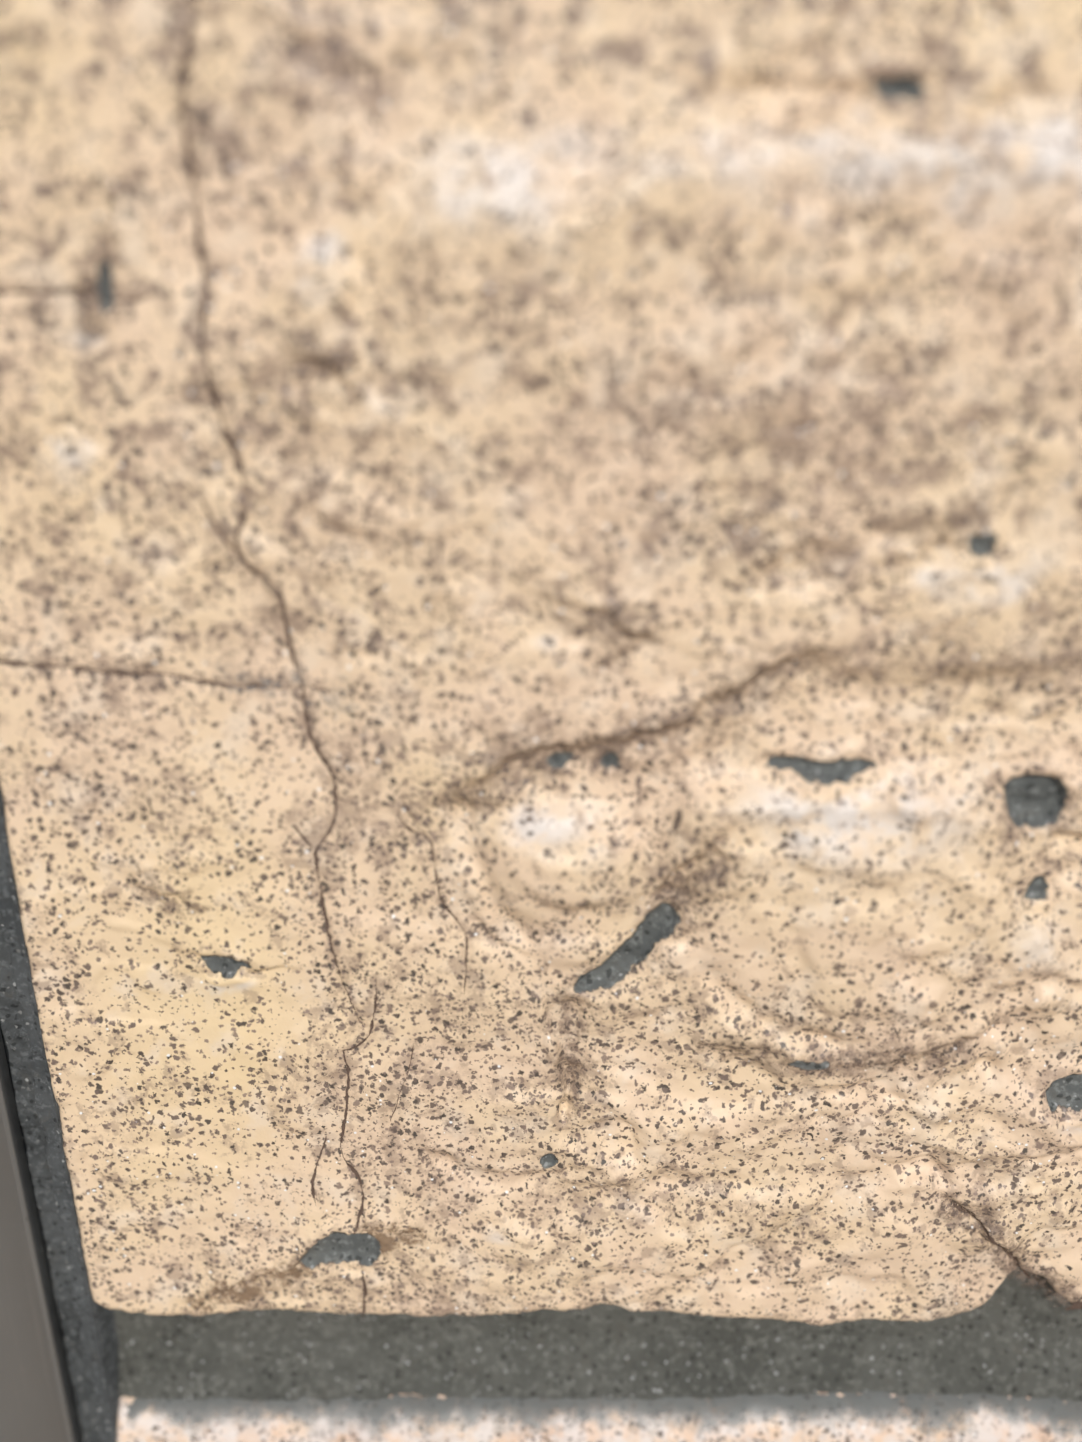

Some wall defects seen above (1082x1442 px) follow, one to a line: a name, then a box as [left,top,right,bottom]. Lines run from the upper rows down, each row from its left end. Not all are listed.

crack [0,0,377,1234]
crack [390,1043,414,1121]
crack [360,1269,368,1318]